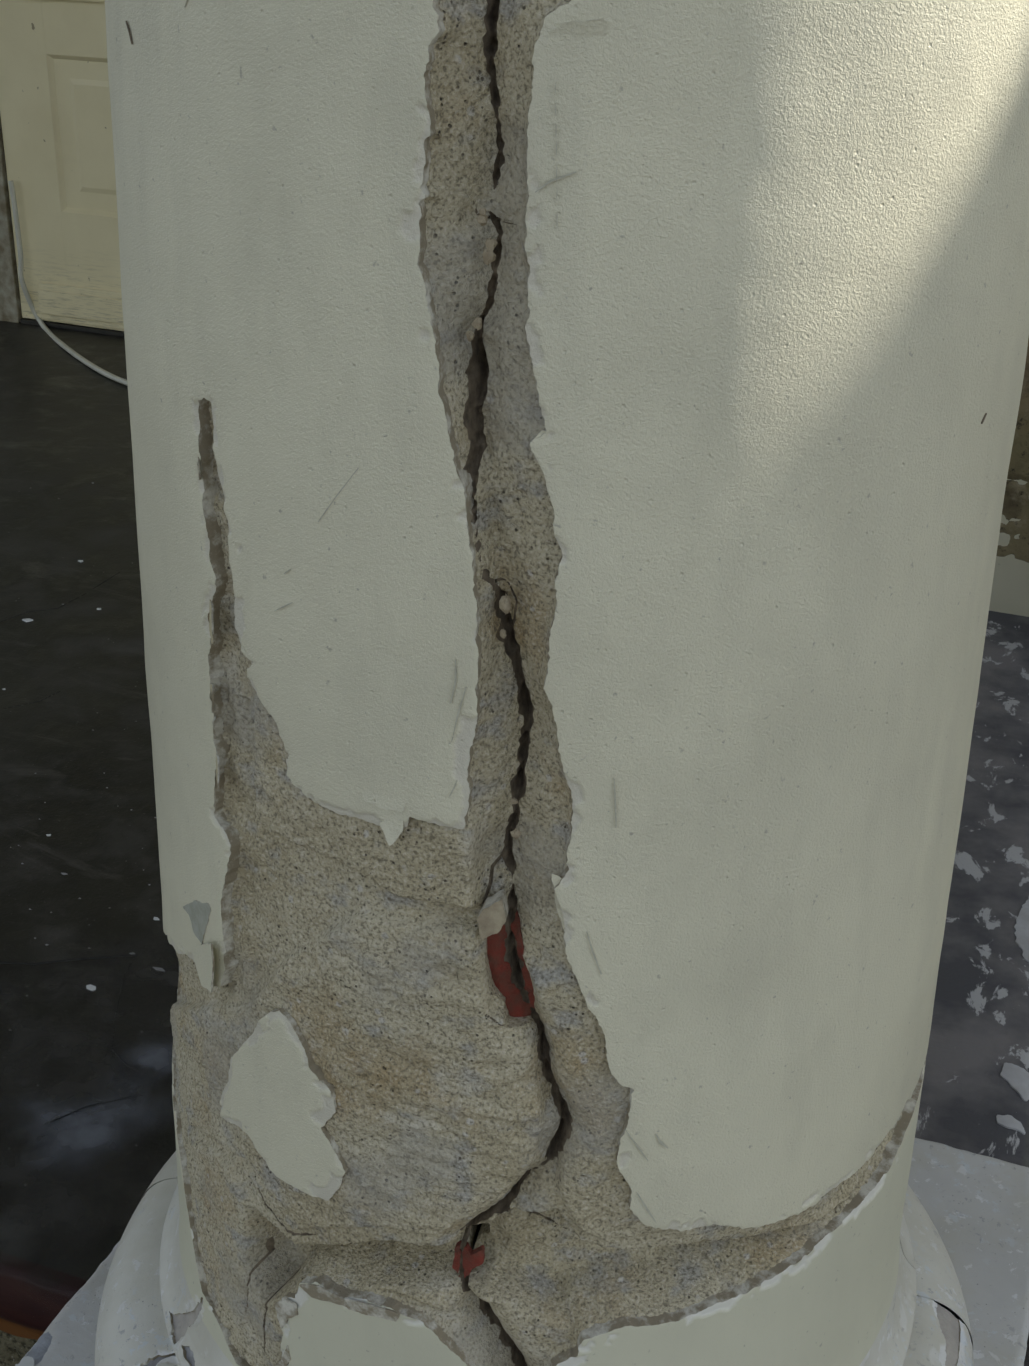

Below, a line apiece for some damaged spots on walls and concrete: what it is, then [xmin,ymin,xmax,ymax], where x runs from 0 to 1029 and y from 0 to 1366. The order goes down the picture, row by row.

spalling [15,1332,52,1366]
flaking render [143,0,717,1366]
crack [459,0,573,1366]
flaking render [996,338,1029,563]